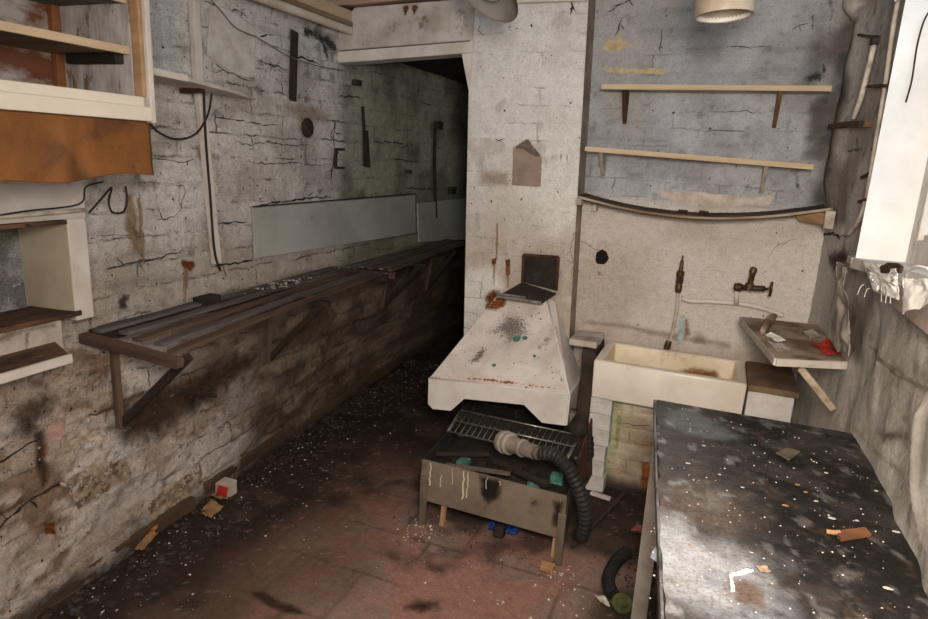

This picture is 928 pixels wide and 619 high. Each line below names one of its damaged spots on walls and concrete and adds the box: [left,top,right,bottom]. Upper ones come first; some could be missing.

crack [608,0,634,37]
crack [213,34,320,82]
mould [304,27,336,58]
crack [374,140,420,162]
crack [98,158,194,270]
crack [212,260,253,276]
corrosion [486,290,506,310]
damp [119,358,250,440]
damp [16,396,48,486]
crack [0,482,64,528]